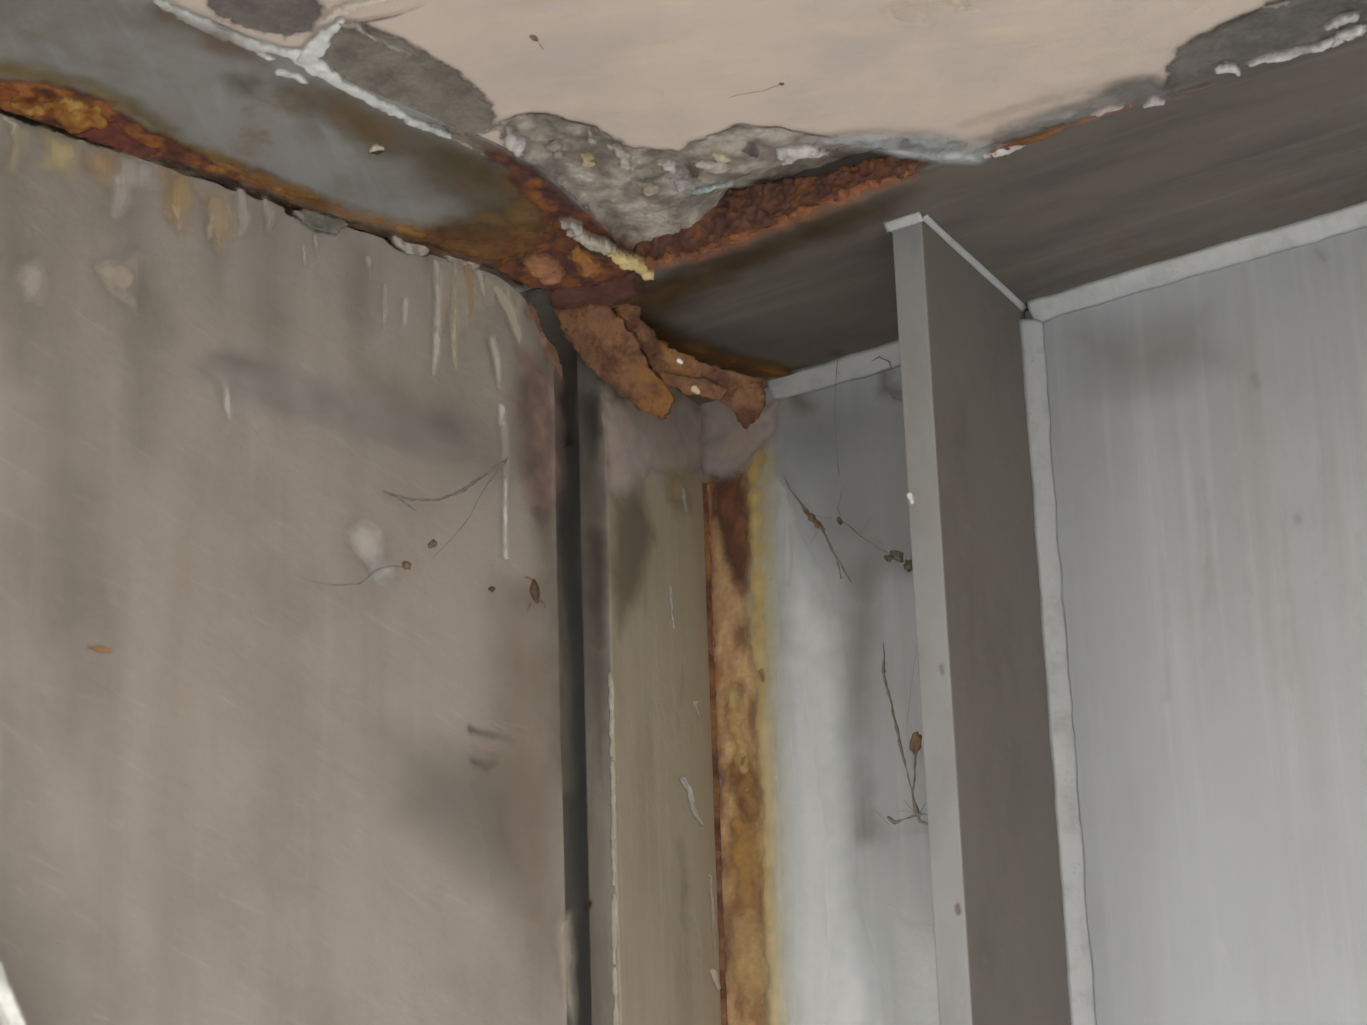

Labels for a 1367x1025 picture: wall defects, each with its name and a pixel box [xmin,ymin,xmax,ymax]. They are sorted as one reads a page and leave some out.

corrosion [207,35,242,52]
spalling [1161,0,1367,92]
spalling [208,0,967,251]
spalling [392,234,481,270]
corrosion [0,66,880,1025]